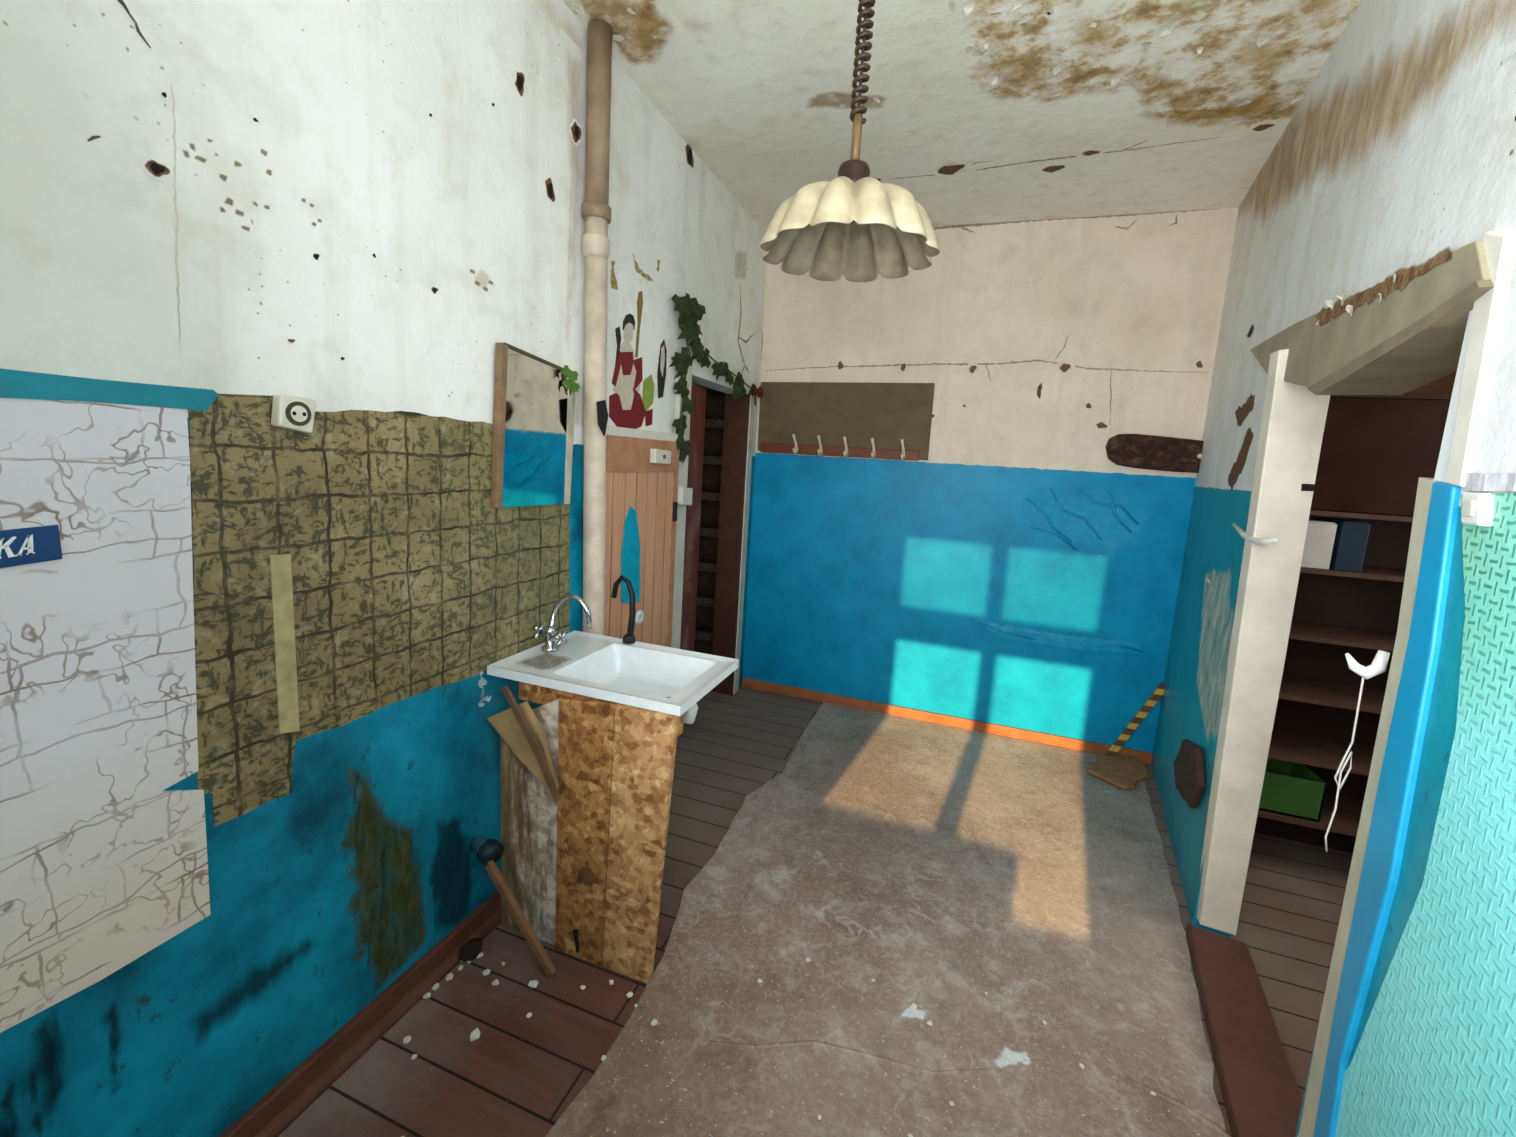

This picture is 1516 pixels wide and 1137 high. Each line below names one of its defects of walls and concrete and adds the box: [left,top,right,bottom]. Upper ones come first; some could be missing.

damp [527,0,721,118]
damp [943,0,1516,241]
damp [356,772,479,984]
damp [180,925,328,1058]
damp [0,1001,77,1137]